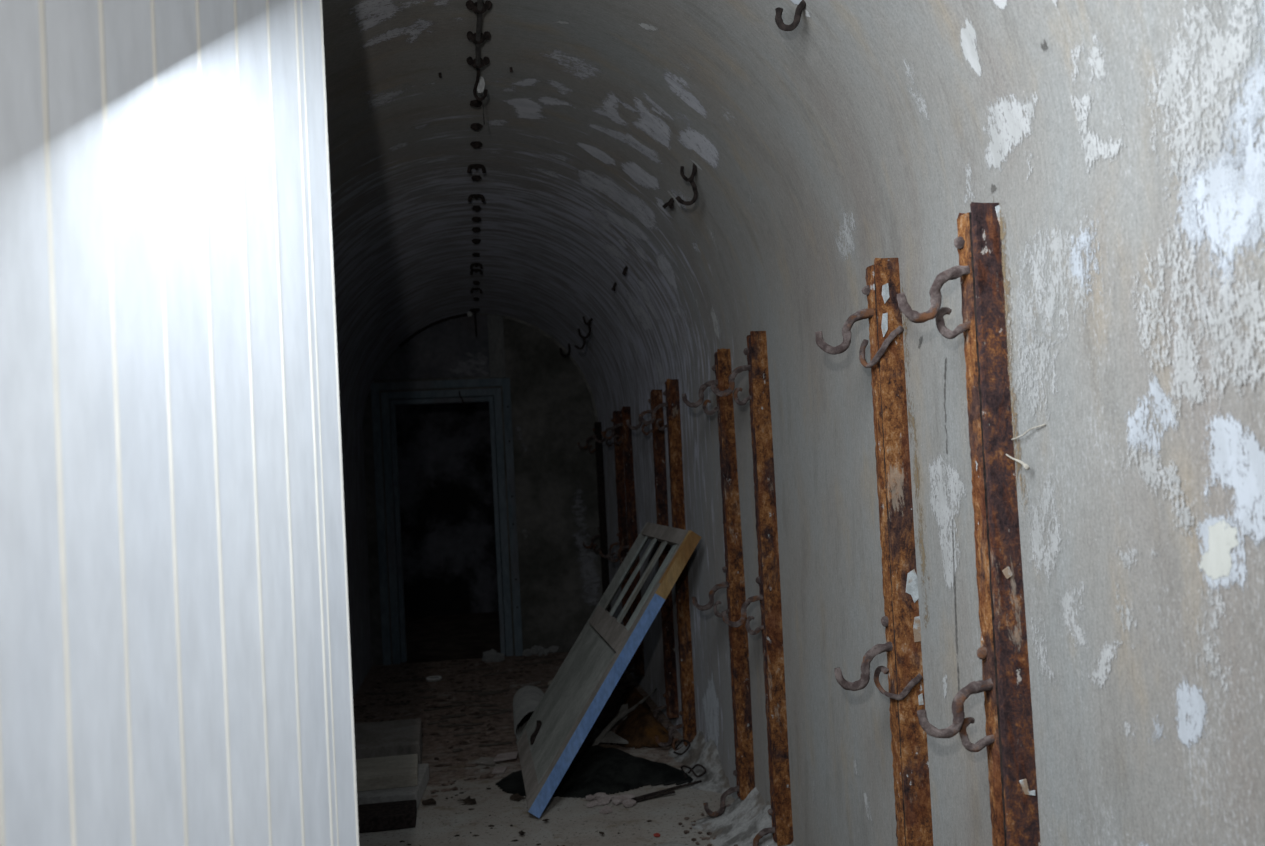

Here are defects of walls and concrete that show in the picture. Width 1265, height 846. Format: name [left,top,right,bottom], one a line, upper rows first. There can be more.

peeling [983,92,1045,192]
corrosion [1000,209,1028,510]